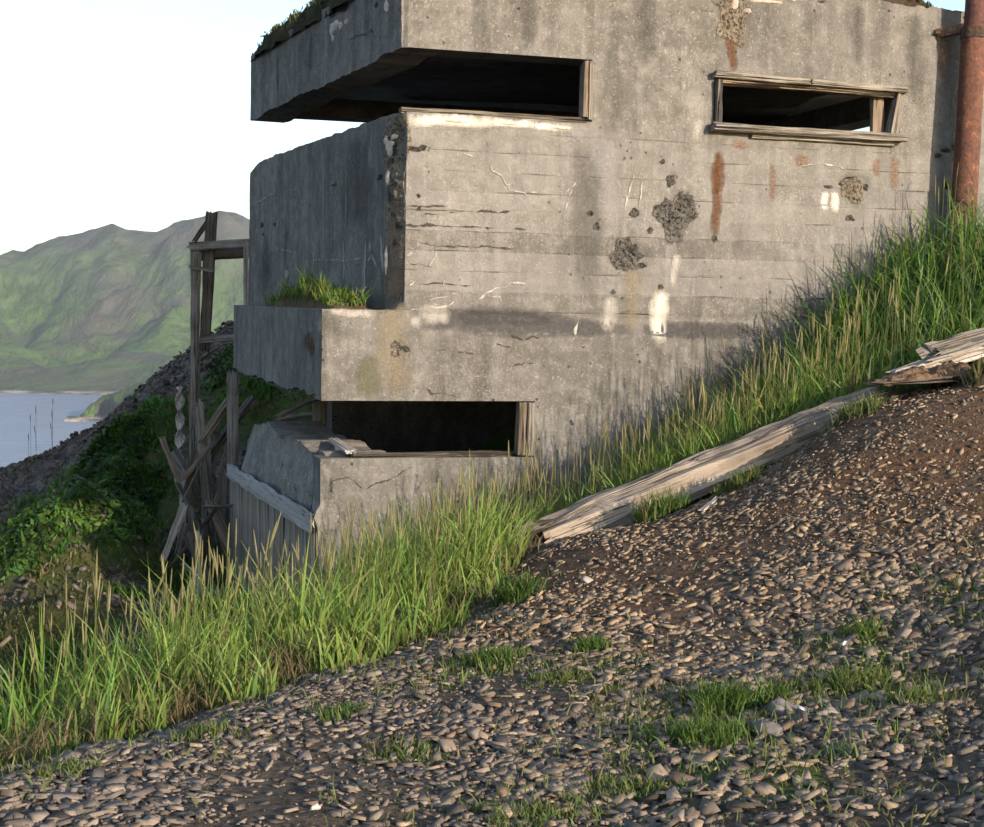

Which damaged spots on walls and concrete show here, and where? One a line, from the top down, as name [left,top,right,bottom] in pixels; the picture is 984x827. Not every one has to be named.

rust [726,36,737,68]
spalling [716,0,796,47]
spalling [377,114,571,312]
spalling [647,175,698,244]
rust [712,155,724,231]
leakage [821,193,839,211]
spalling [825,176,868,204]
spalling [610,236,647,272]
leakage [412,271,637,336]
leakage [647,257,758,339]